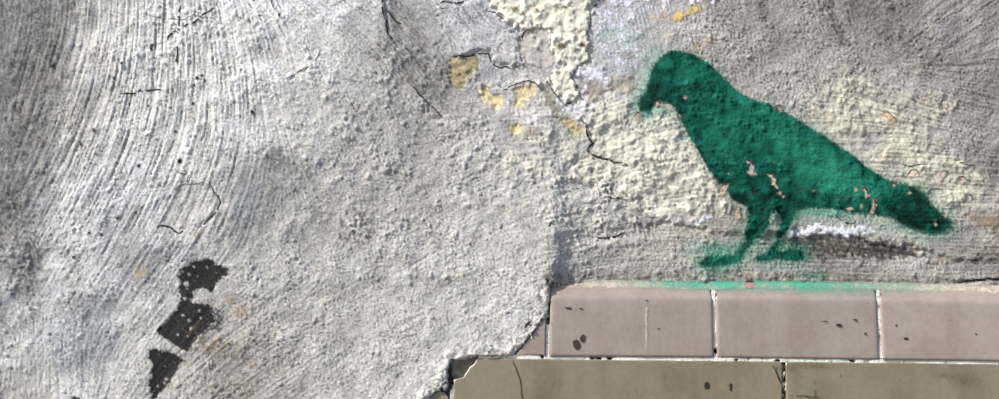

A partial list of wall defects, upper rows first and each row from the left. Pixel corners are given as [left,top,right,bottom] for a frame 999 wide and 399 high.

crack [382,0,412,58]
crack [409,82,443,118]
crack [451,52,637,200]
peeling [489,0,741,222]
crack [136,171,221,234]
spalling [447,355,478,389]